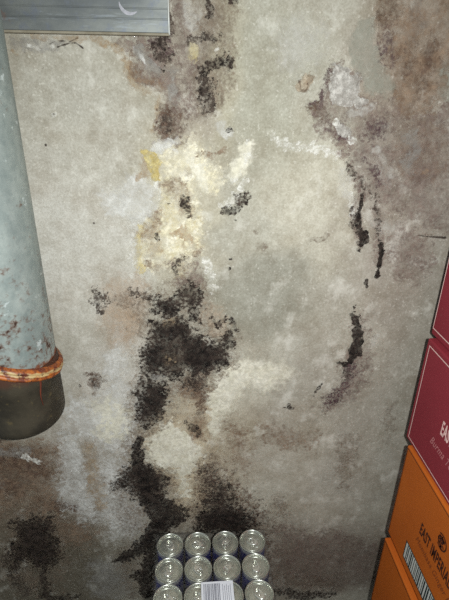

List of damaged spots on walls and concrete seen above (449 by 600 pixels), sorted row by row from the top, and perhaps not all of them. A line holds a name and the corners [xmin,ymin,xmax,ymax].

water stain [271,0,449,288]
water stain [0,0,349,600]
water stain [314,305,373,412]